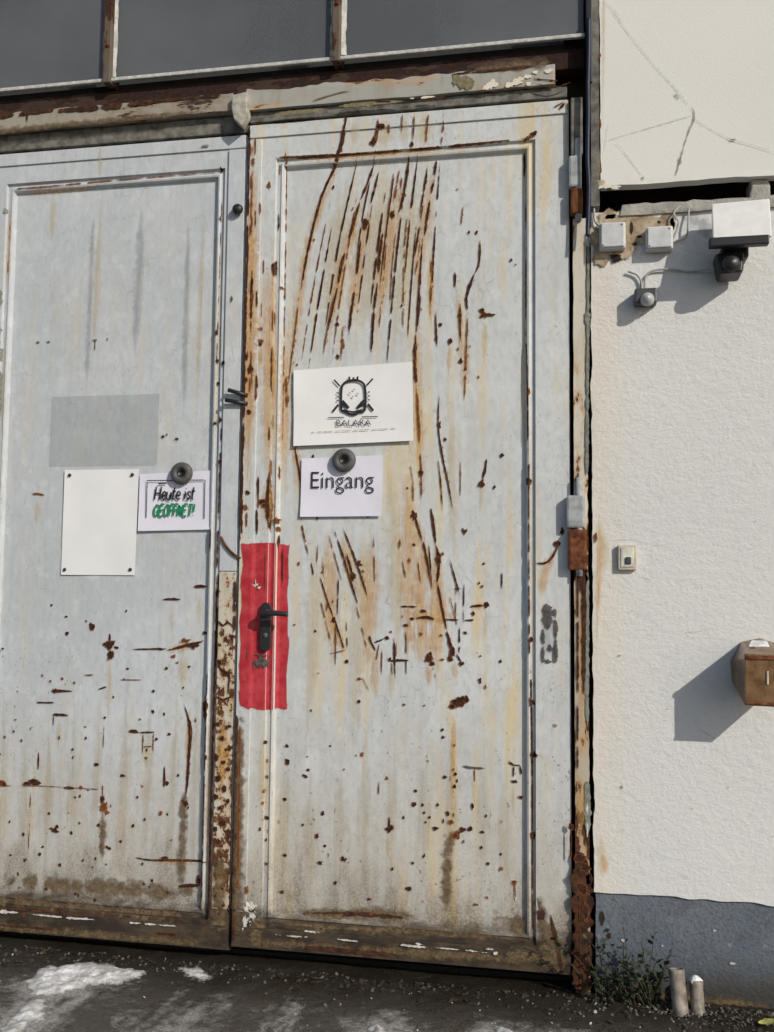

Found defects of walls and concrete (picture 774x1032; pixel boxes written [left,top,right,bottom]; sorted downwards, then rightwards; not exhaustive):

peeling [274,91,445,115]
peeling [452,68,553,90]
crack [675,94,695,174]
rust [240,126,281,540]
rust [276,113,509,677]
spalling [585,180,749,474]
rust [0,589,239,945]
rust [262,811,594,992]
rust [448,695,469,709]
peeling [508,680,538,930]
peeling [526,464,558,664]
rust [576,528,598,769]